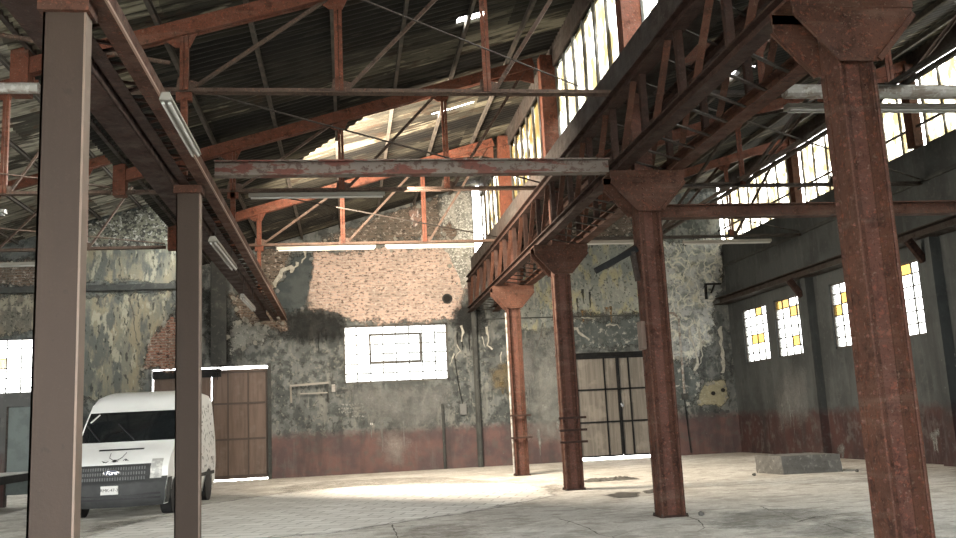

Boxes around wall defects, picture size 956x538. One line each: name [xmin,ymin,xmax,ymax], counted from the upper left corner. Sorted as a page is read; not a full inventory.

peeling [0,257,35,337]
peeling [83,205,176,402]
flaking render [226,191,482,364]
damp [523,348,559,449]
peeling [663,238,729,408]